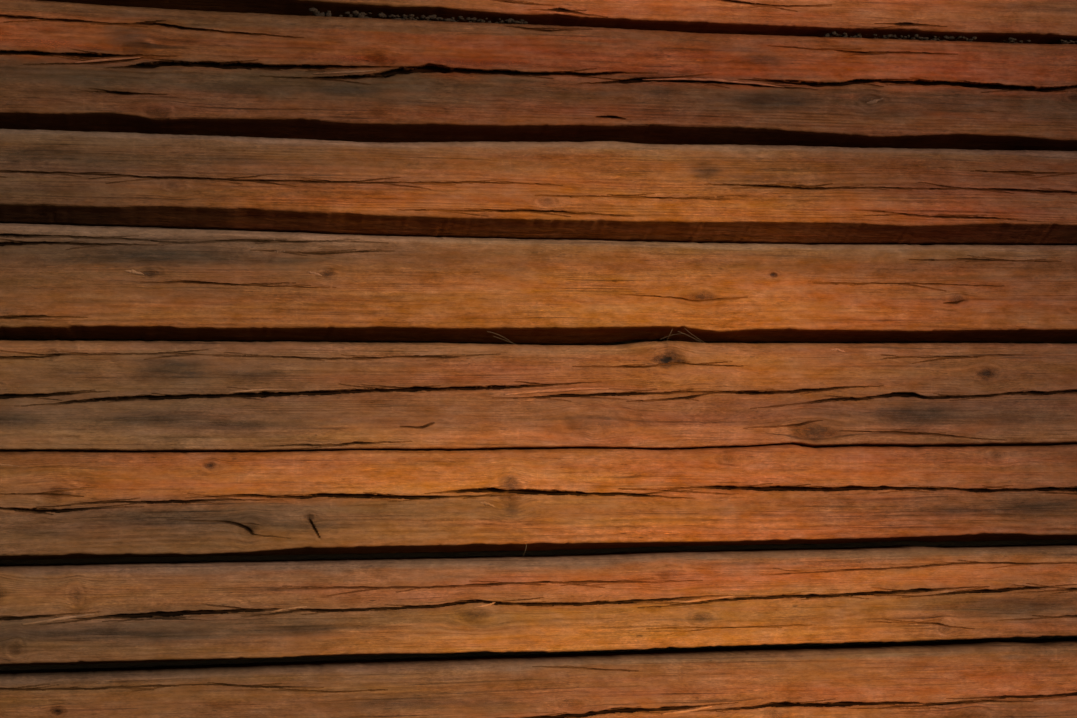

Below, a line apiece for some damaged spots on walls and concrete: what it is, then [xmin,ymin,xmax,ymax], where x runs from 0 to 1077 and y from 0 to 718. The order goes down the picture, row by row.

crack [0,14,1077,95]
crack [0,314,88,322]
crack [0,349,1077,441]
crack [0,483,1077,538]
crack [0,560,1077,635]
crack [0,682,388,693]
crack [526,690,1077,718]